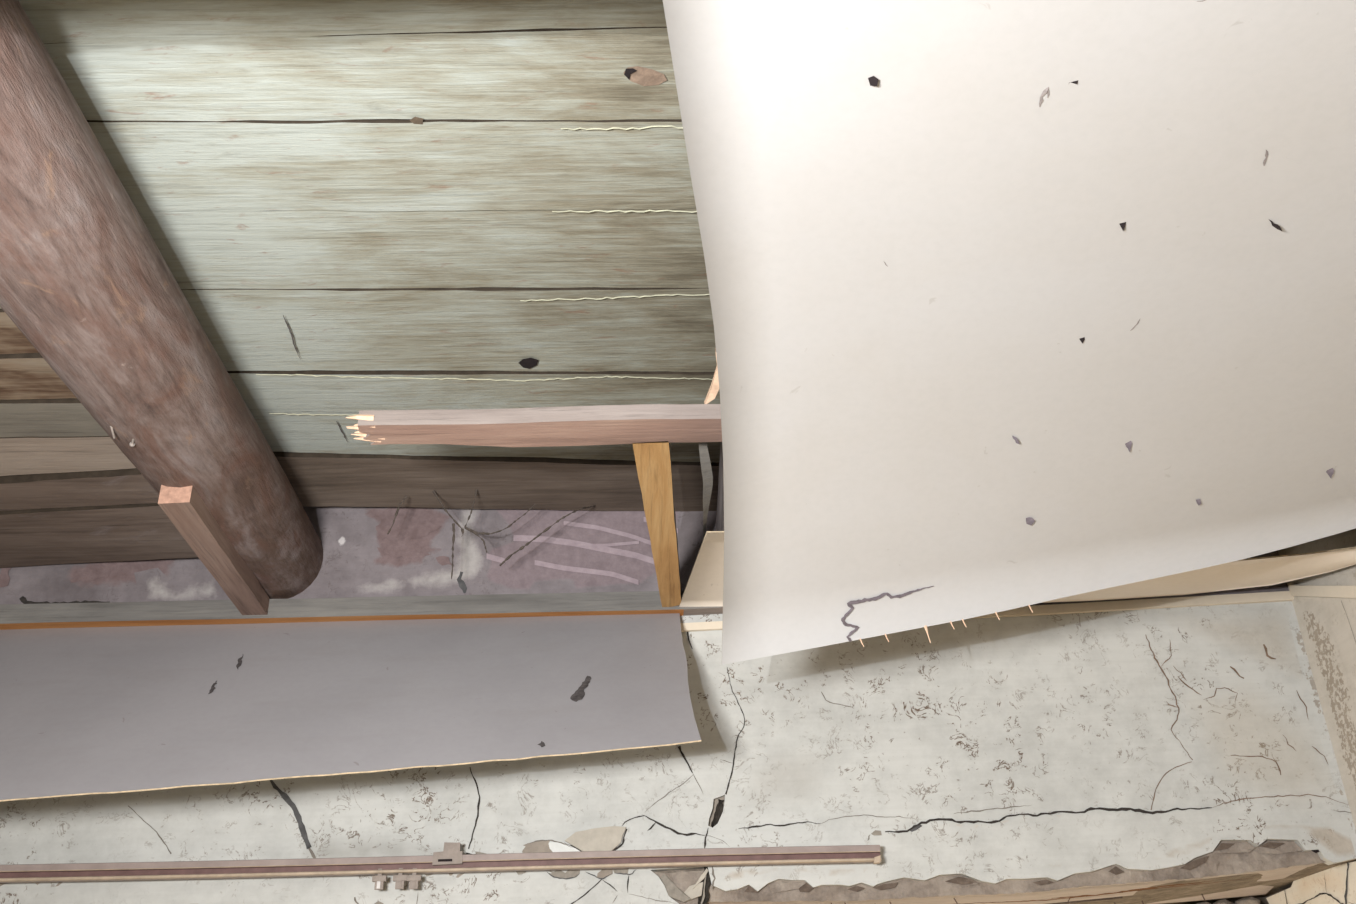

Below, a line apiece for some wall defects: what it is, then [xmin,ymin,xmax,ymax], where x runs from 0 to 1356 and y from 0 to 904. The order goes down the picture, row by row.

crack [457,571,467,593]
crack [571,636,1353,904]
crack [270,780,316,858]
crack [466,768,480,854]
peeling [522,826,627,853]
spalling [547,868,635,879]
spalling [652,840,1325,904]